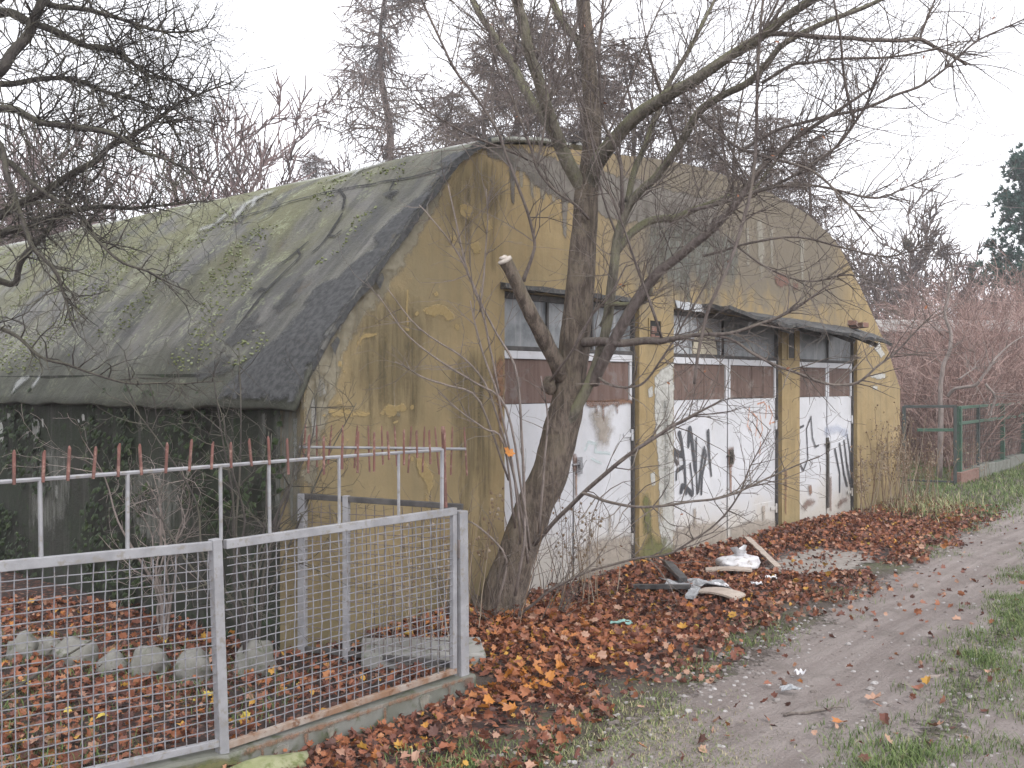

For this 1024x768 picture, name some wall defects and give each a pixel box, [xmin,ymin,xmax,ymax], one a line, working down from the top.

spalling [302,174,450,486]